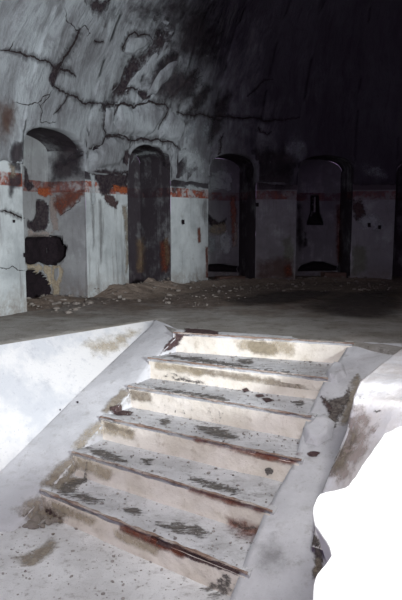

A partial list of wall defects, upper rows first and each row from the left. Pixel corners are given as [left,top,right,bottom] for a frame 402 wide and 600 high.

crack [1,10,298,156]
spalling [25,196,67,295]
corrosion [38,187,85,214]
corrosion [160,240,169,270]
spalling [303,362,376,479]
corrosion [120,526,240,575]